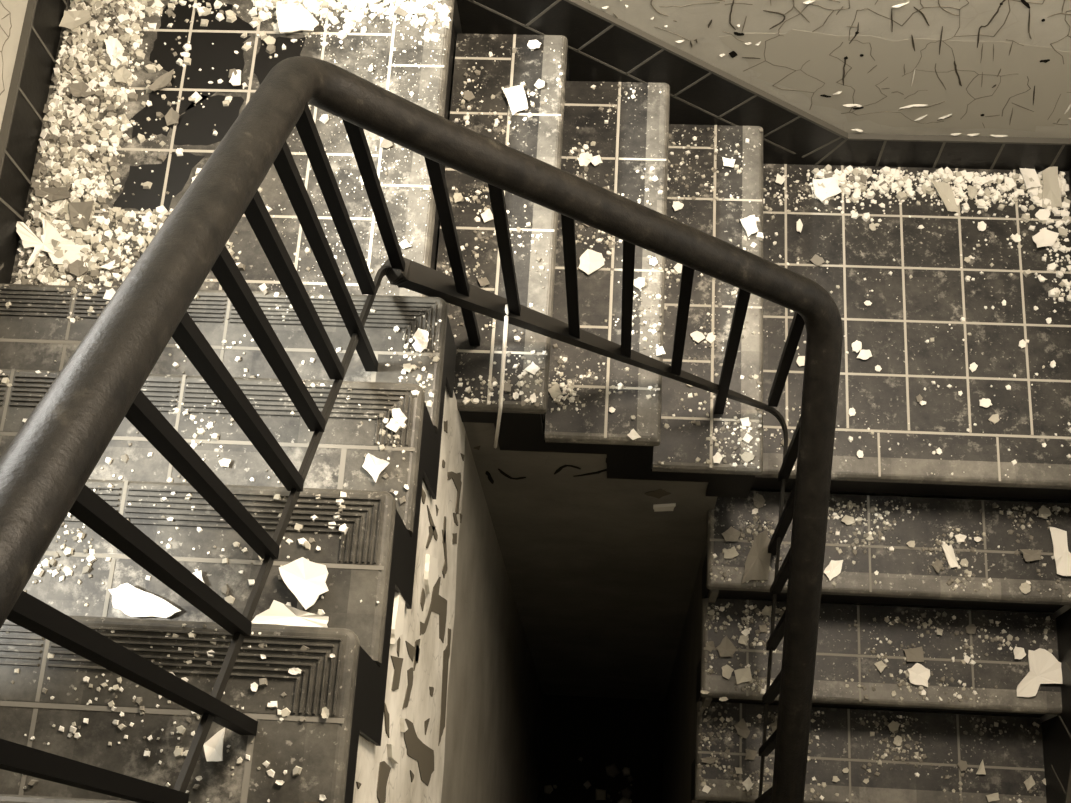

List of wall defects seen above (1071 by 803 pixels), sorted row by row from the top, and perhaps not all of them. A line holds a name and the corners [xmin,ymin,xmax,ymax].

crack [651,0,810,47]
crack [830,0,1071,123]
peeling [353,388,480,803]